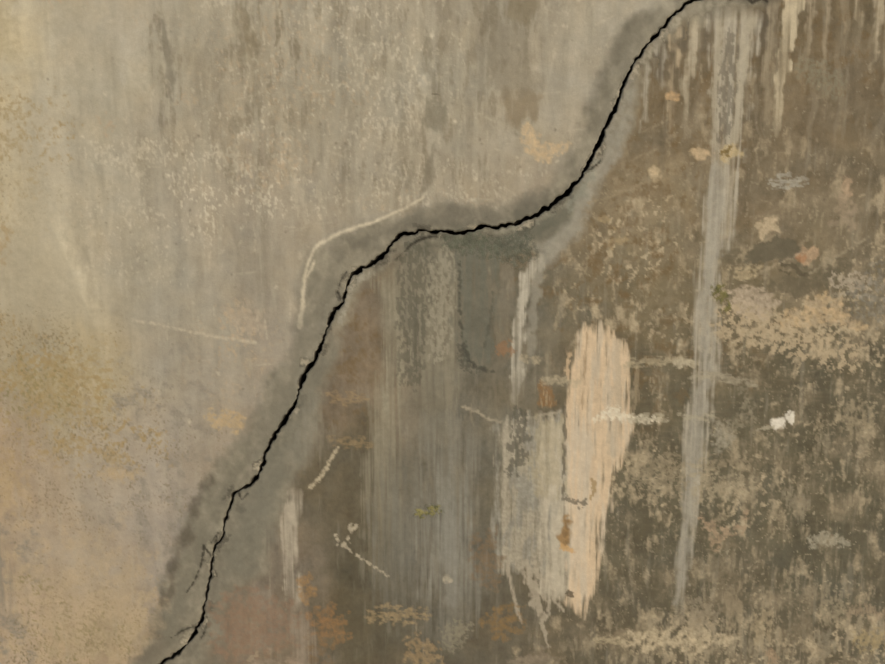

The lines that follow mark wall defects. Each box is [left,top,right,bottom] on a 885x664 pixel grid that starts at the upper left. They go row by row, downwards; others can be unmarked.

water stain [851,0,885,98]
water stain [263,388,323,664]
peeling [363,600,476,664]
water stain [356,240,553,652]
crack [158,0,767,664]
peeling [487,318,777,664]
water stain [636,0,835,614]
water stain [843,254,885,332]